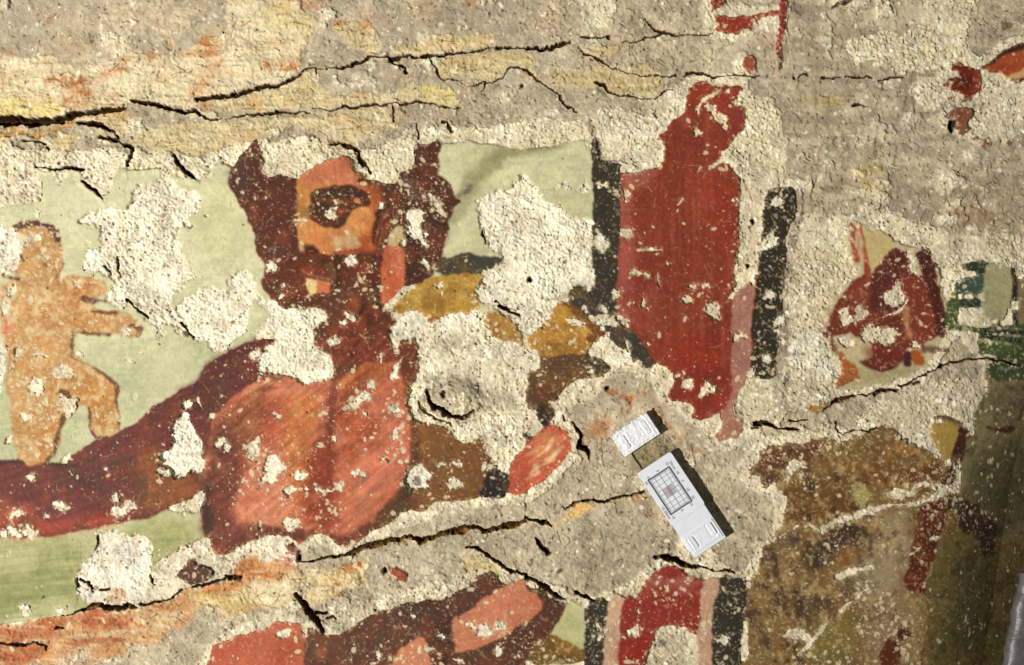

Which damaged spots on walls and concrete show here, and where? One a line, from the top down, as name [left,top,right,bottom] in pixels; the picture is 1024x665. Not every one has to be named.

crack [0,18,760,200]
spalling [846,0,1024,145]
spalling [0,0,789,385]
spalling [0,491,750,665]
spalling [406,461,464,492]
crack [301,490,646,603]
spalling [388,175,633,475]
spalling [550,289,721,439]
crack [653,554,736,574]
spalling [734,207,1024,430]
crack [750,357,1021,435]
spalling [855,371,988,453]